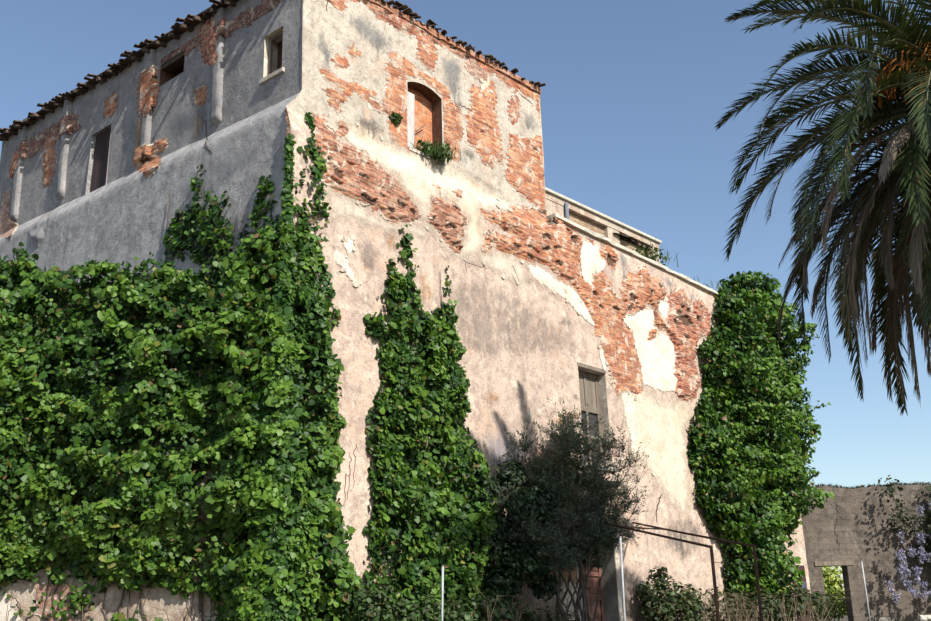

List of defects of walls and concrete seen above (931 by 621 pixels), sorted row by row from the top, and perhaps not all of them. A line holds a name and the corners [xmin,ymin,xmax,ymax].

flaking render [198,17,220,67]
flaking render [136,65,160,117]
flaking render [42,137,58,189]
flaking render [133,138,170,178]
spalling [311,33,712,514]
crack [343,444,357,505]